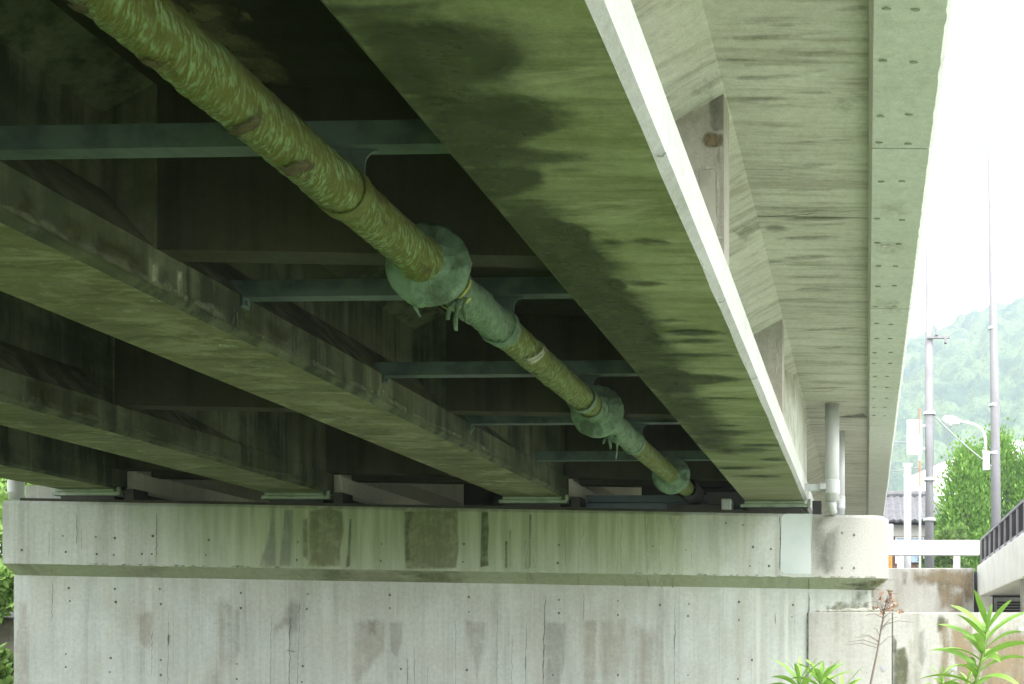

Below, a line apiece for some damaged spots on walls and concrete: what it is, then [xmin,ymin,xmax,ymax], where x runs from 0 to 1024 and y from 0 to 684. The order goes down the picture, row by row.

rust [704,133,723,147]
water stain [329,7,781,478]
water stain [304,510,351,566]